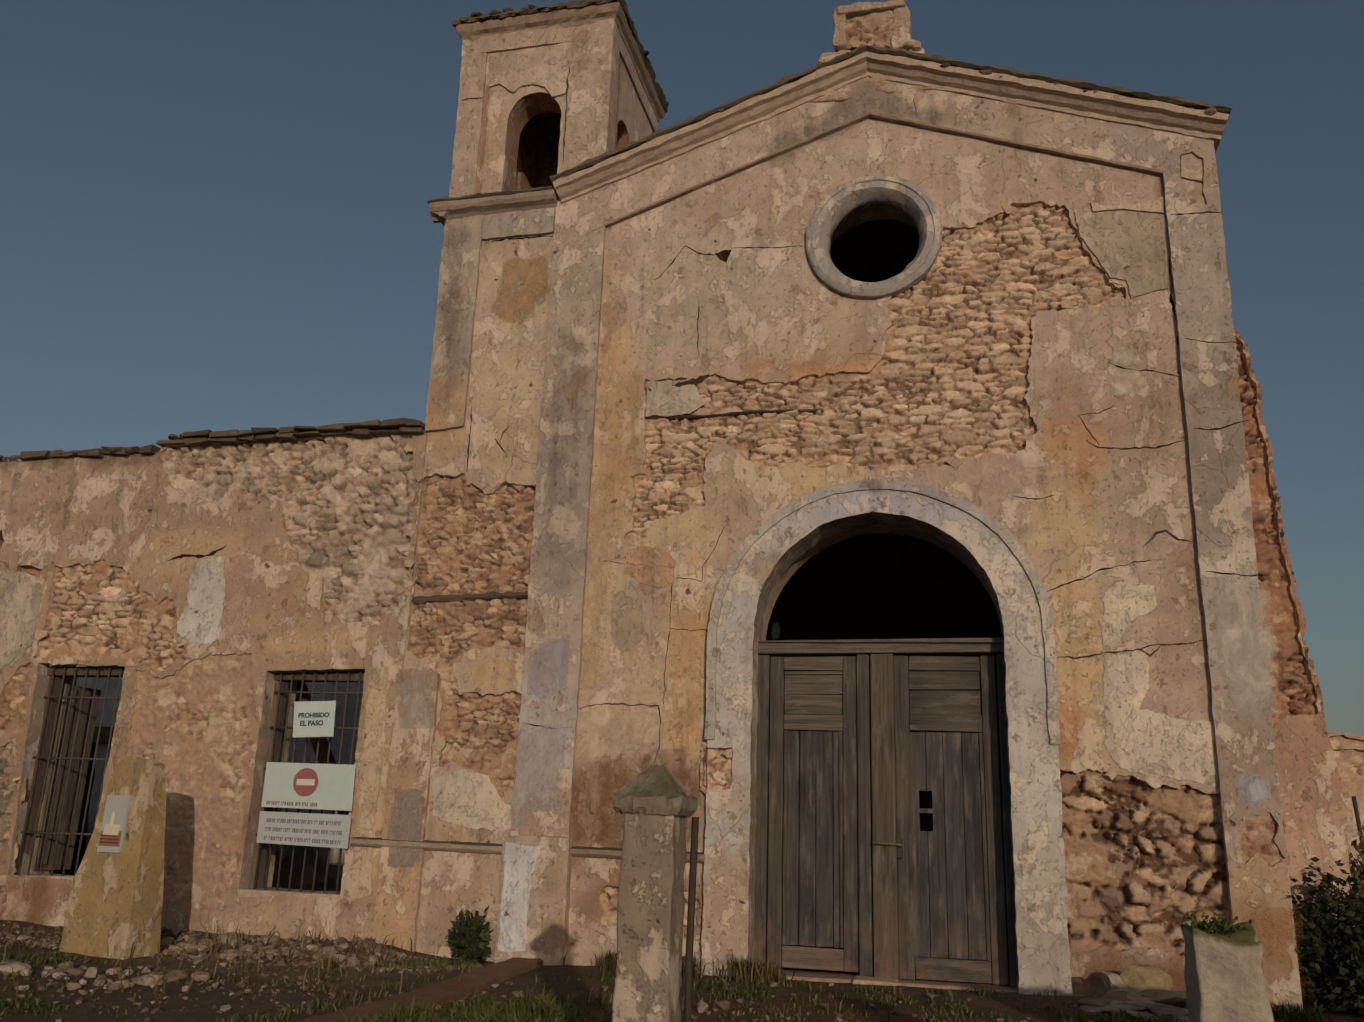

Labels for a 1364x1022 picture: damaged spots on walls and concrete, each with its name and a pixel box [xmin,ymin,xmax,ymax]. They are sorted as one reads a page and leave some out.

spalling [715,250,731,263]
crack [654,246,802,280]
peeling [942,197,1168,304]
crack [1109,211,1241,377]
peeling [624,377,706,541]
crack [1078,404,1250,450]
crack [1047,530,1192,592]
crack [1206,570,1269,578]
peeling [0,560,123,785]
crack [1061,640,1205,659]
spalling [102,652,260,916]
peeling [431,691,542,952]